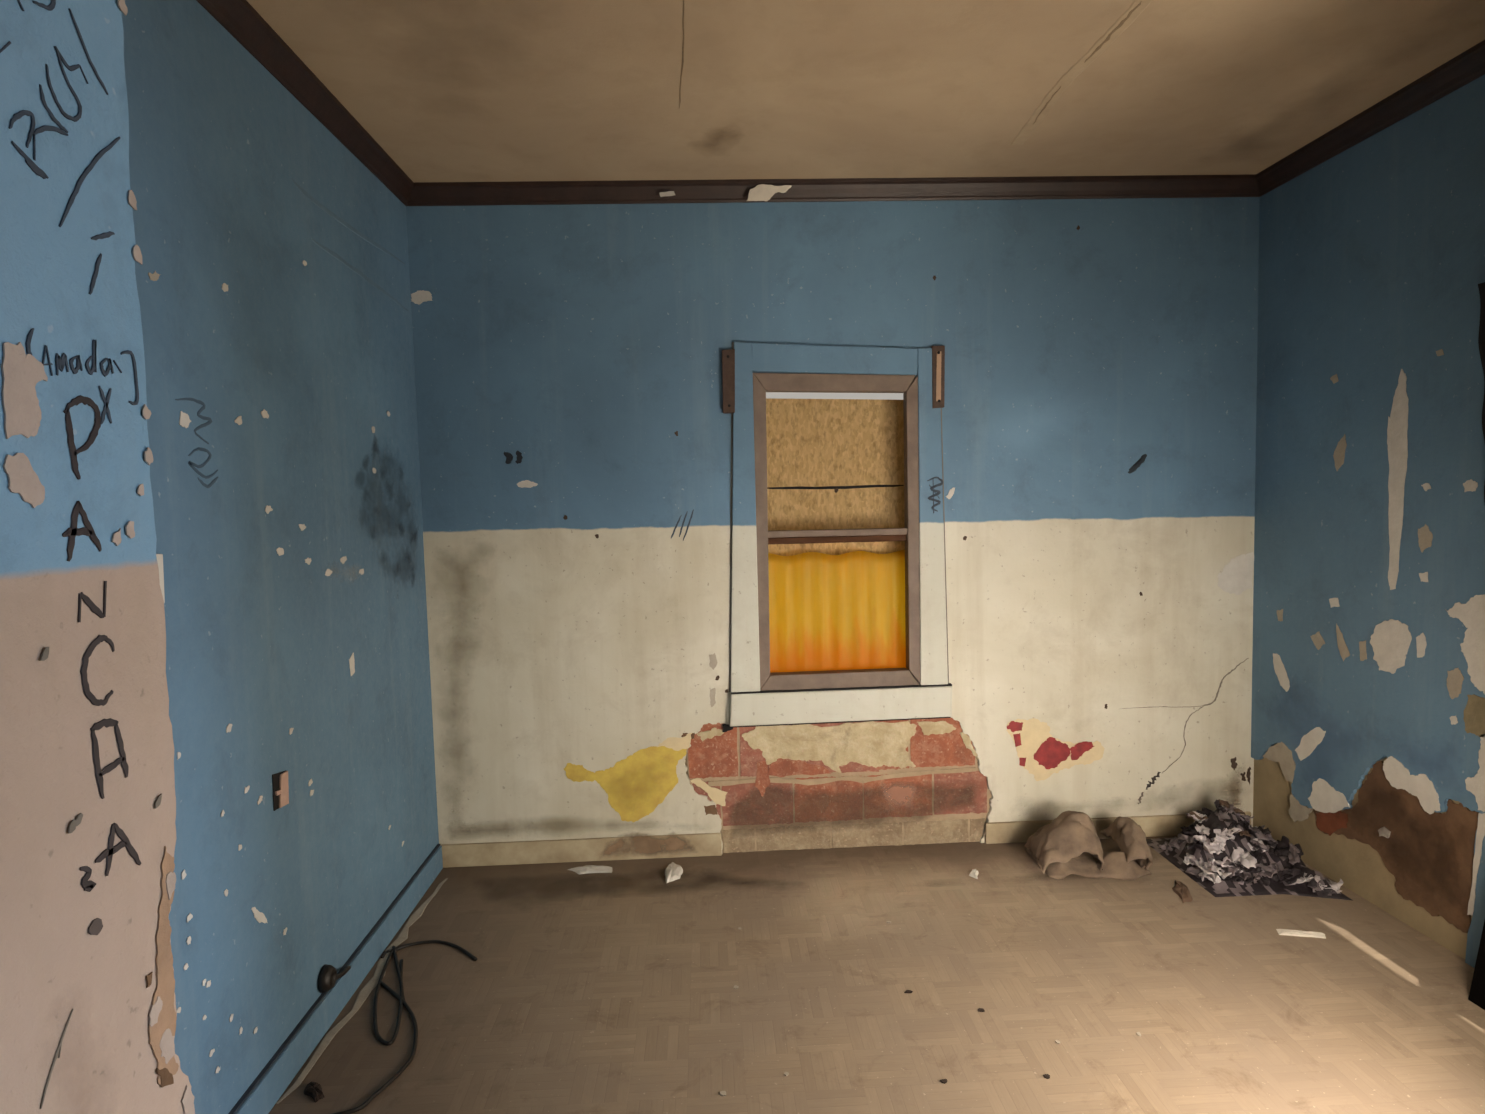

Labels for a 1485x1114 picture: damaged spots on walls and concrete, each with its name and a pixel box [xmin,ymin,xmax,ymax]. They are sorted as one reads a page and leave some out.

crack [678,0,686,108]
crack [1011,0,1153,145]
peeling [1387,369,1433,590]
spalling [564,688,992,853]
peeling [1006,718,1105,781]
crack [1122,658,1249,773]
spalling [1263,595,1485,933]
spalling [146,846,195,1114]